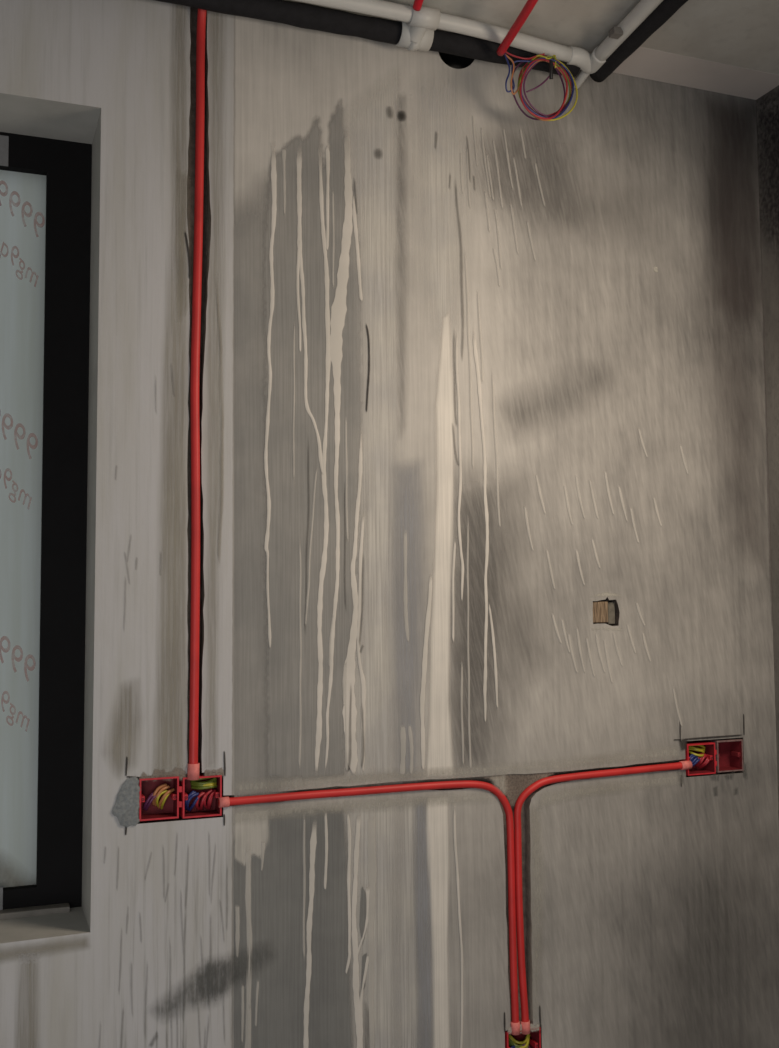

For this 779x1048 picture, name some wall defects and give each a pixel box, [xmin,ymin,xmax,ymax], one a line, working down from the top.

damp [221,84,545,797]
damp [234,797,463,1048]